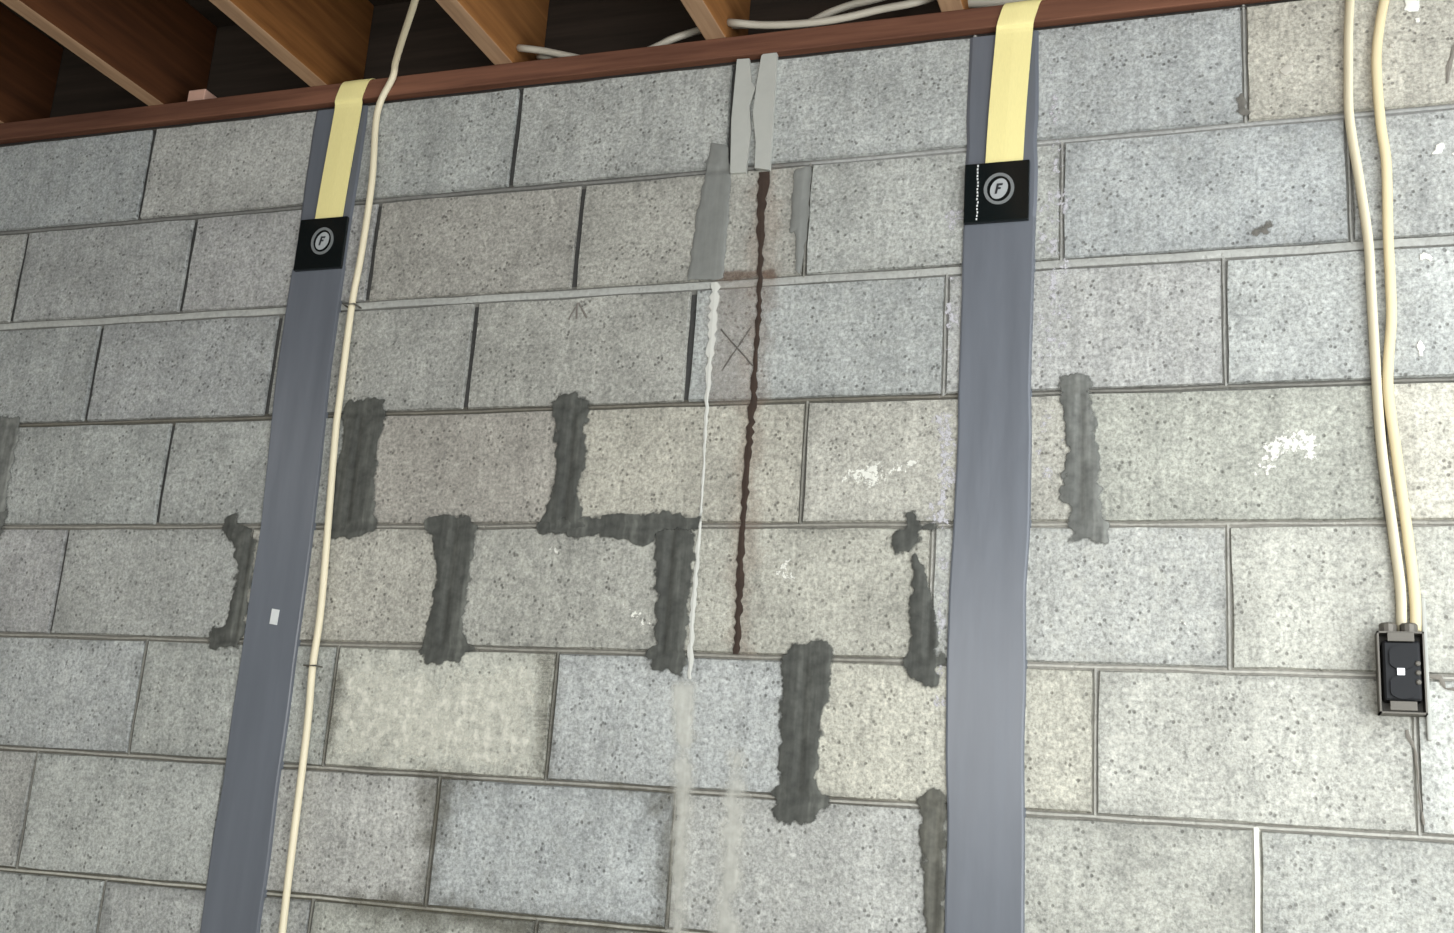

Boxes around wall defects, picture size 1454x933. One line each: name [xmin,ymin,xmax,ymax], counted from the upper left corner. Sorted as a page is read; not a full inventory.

crack [733,171,770,654]